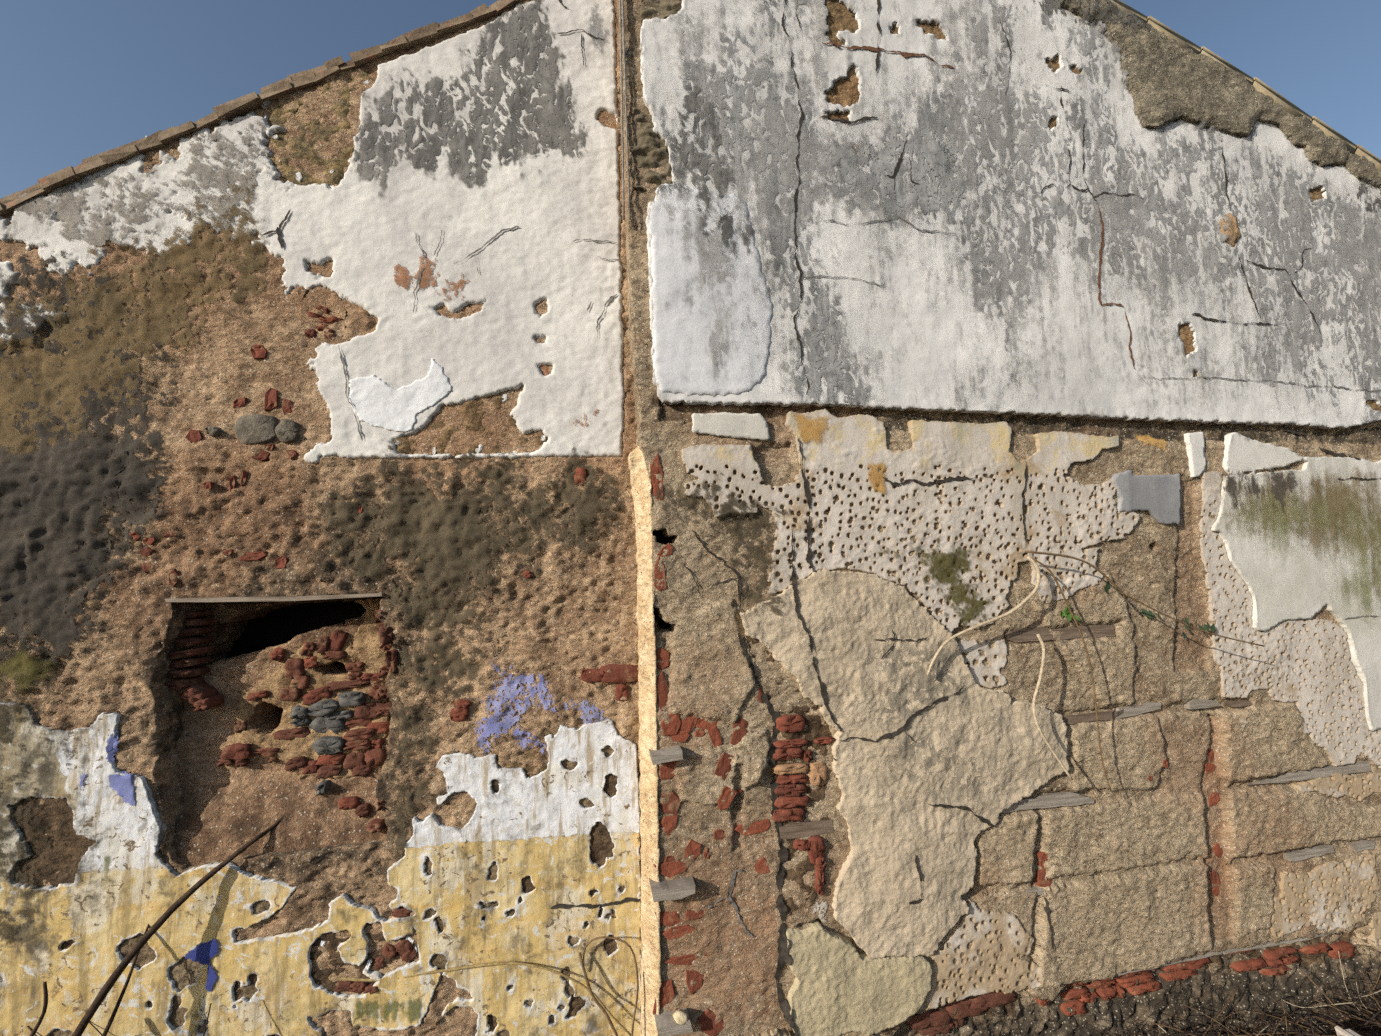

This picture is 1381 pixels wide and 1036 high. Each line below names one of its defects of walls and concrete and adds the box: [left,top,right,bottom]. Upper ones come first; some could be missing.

spalling [0,0,523,217]
damp [394,251,472,301]
crack [781,0,958,395]
damp [659,0,1381,422]
crack [1041,85,1381,392]
spalling [11,768,96,887]
damp [0,120,271,946]
spalling [310,907,447,995]
flaking render [581,648,747,810]
crack [683,530,799,1036]
crack [791,438,975,742]
damp [1223,464,1381,553]